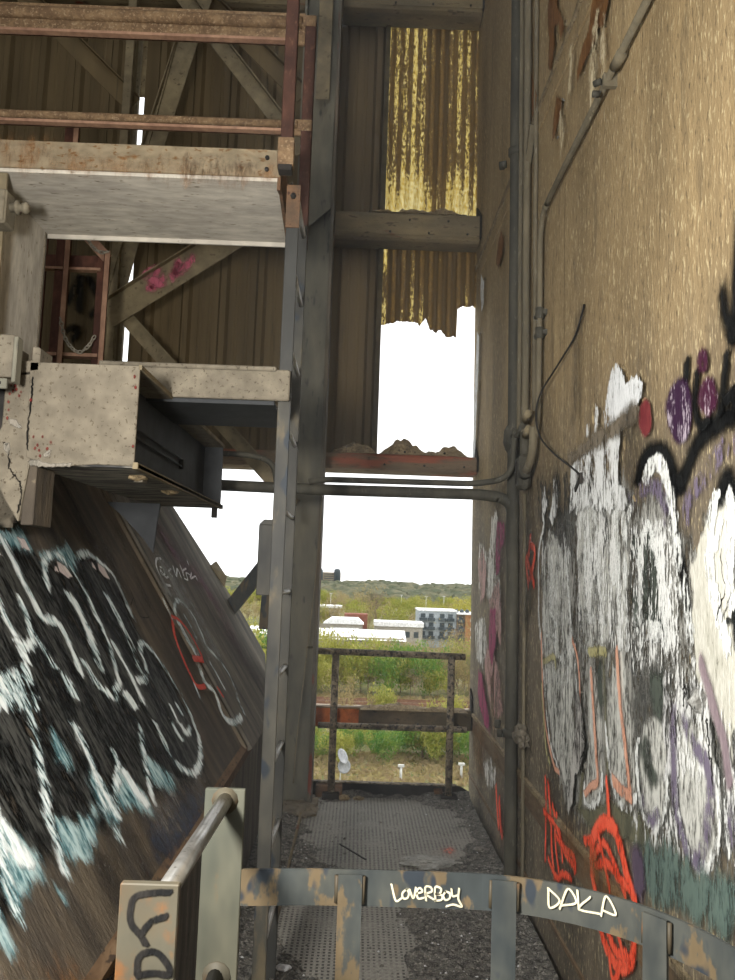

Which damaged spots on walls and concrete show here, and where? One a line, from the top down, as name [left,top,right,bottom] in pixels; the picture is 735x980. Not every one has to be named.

peeling [548,0,568,70]
peeling [577,0,614,82]
peeling [552,96,565,141]
crack [3,377,34,513]